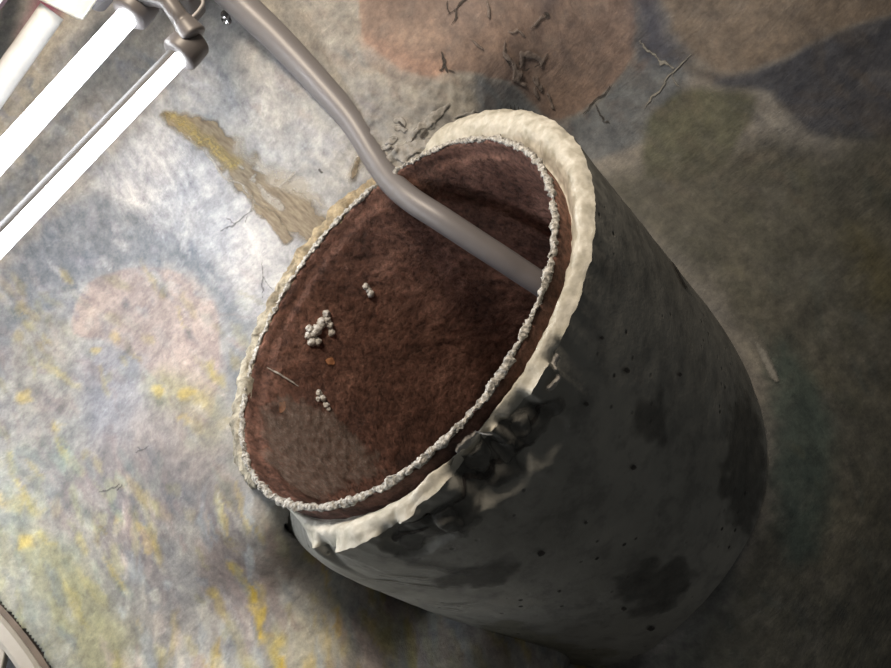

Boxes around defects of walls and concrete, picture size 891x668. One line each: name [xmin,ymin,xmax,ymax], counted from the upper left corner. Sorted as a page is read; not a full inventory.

crack [446,0,465,25]
crack [439,52,454,73]
crack [583,86,610,123]
spalling [547,354,561,391]
spalling [392,399,565,550]